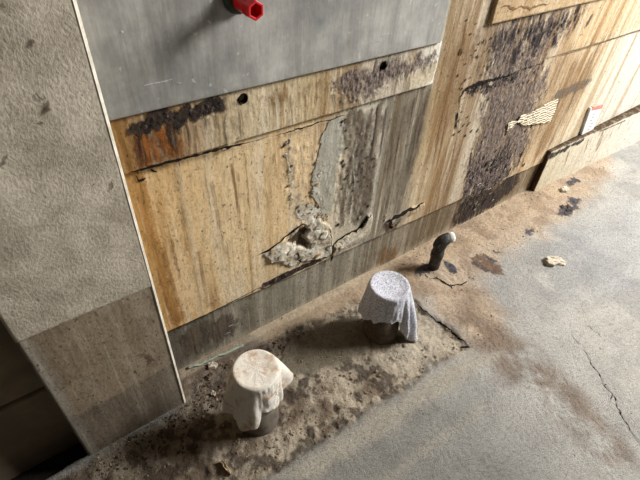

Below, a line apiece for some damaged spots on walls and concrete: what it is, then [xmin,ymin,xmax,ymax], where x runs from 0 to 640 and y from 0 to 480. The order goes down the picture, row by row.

rust [134,124,182,168]
crack [132,115,345,182]
water stain [328,49,438,227]
water stain [433,2,597,229]
peeling [507,98,558,131]
flaking render [257,115,345,267]
crack [384,202,424,229]
crack [416,301,469,348]
crack [573,337,637,440]